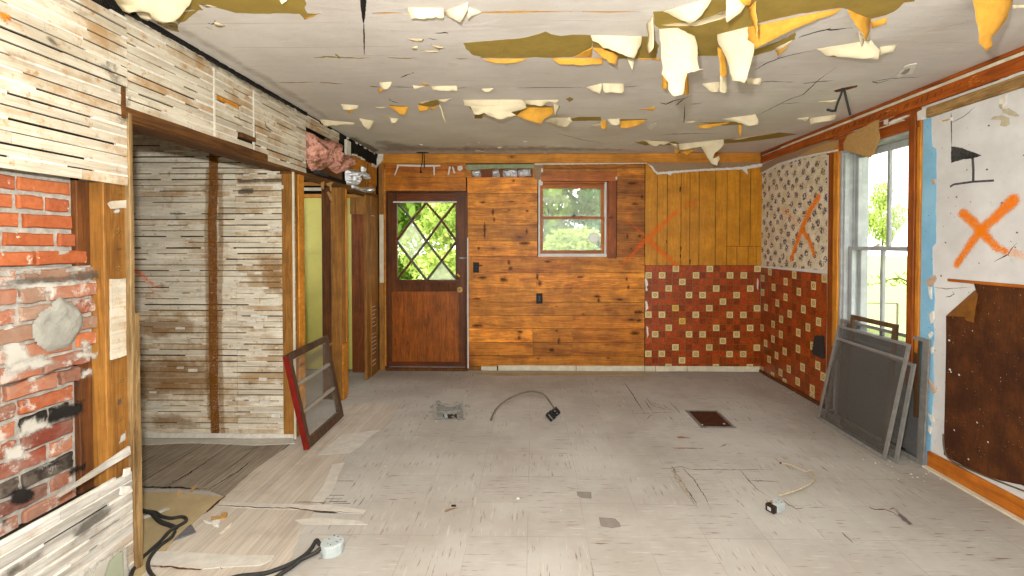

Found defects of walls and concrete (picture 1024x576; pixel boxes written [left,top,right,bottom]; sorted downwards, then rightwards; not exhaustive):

crack [483,8,637,16]
crack [278,12,447,103]
crack [755,28,846,109]
flaking render [988,95,1019,126]